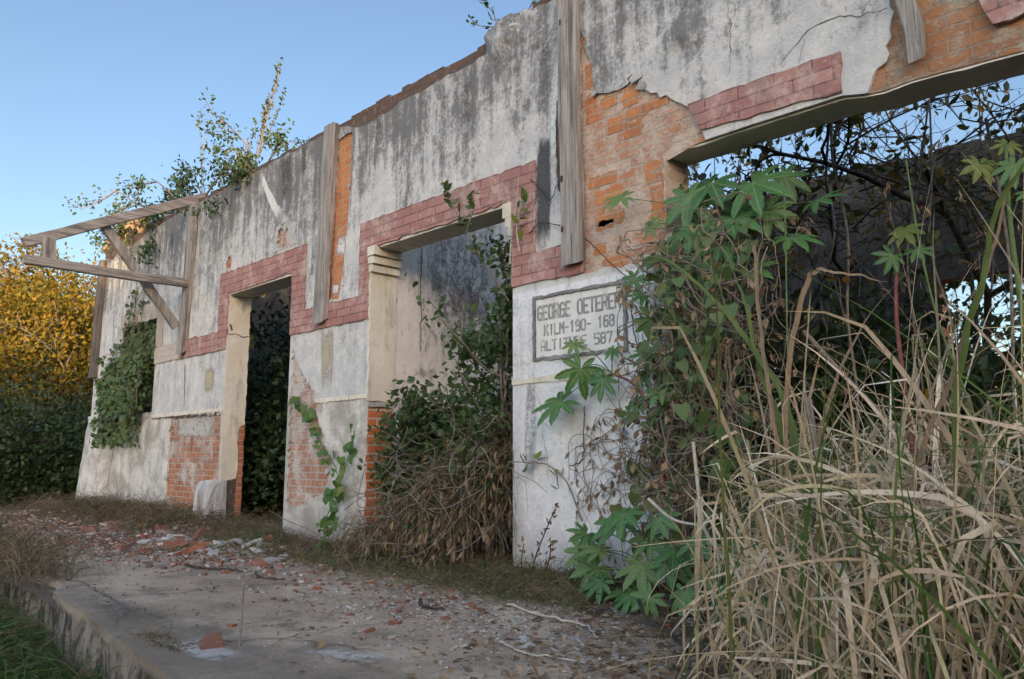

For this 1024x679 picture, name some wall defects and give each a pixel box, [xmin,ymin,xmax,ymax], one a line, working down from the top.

crack [780,3,886,65]
peeling [869,0,1024,94]
peeling [329,133,353,302]
damp [536,140,551,240]
peeling [580,27,707,274]
peeling [164,412,221,511]
peeling [288,354,329,508]